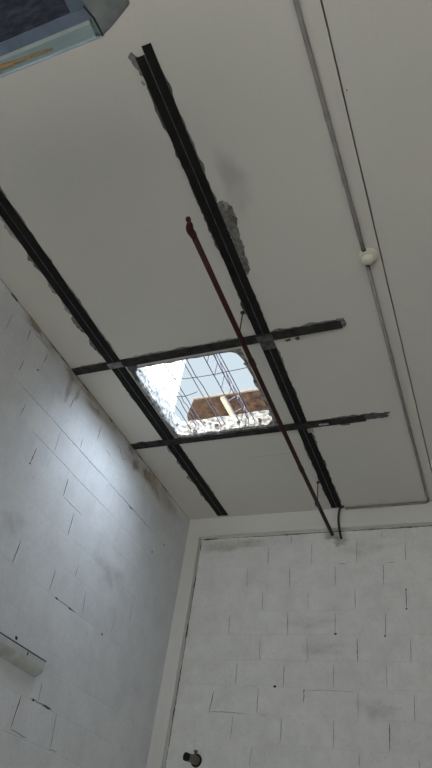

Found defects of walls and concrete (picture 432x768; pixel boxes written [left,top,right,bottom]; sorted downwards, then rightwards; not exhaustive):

flaking render [217,200,250,275]
spalling [127,349,278,438]